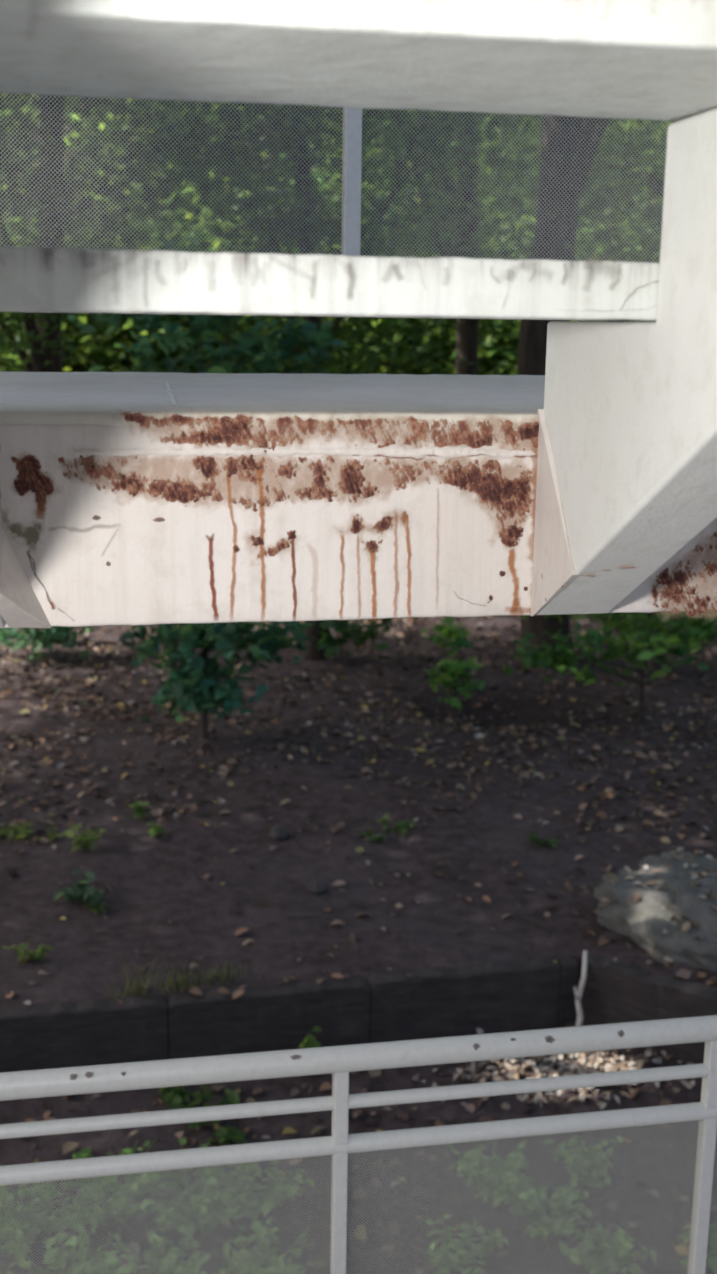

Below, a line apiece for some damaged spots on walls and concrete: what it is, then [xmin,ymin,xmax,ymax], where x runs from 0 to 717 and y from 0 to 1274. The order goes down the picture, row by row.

corrosion [11,455,54,512]
crack [28,551,54,609]
corrosion [209,469,297,618]
corrosion [339,512,411,618]
corrosion [499,550,528,612]